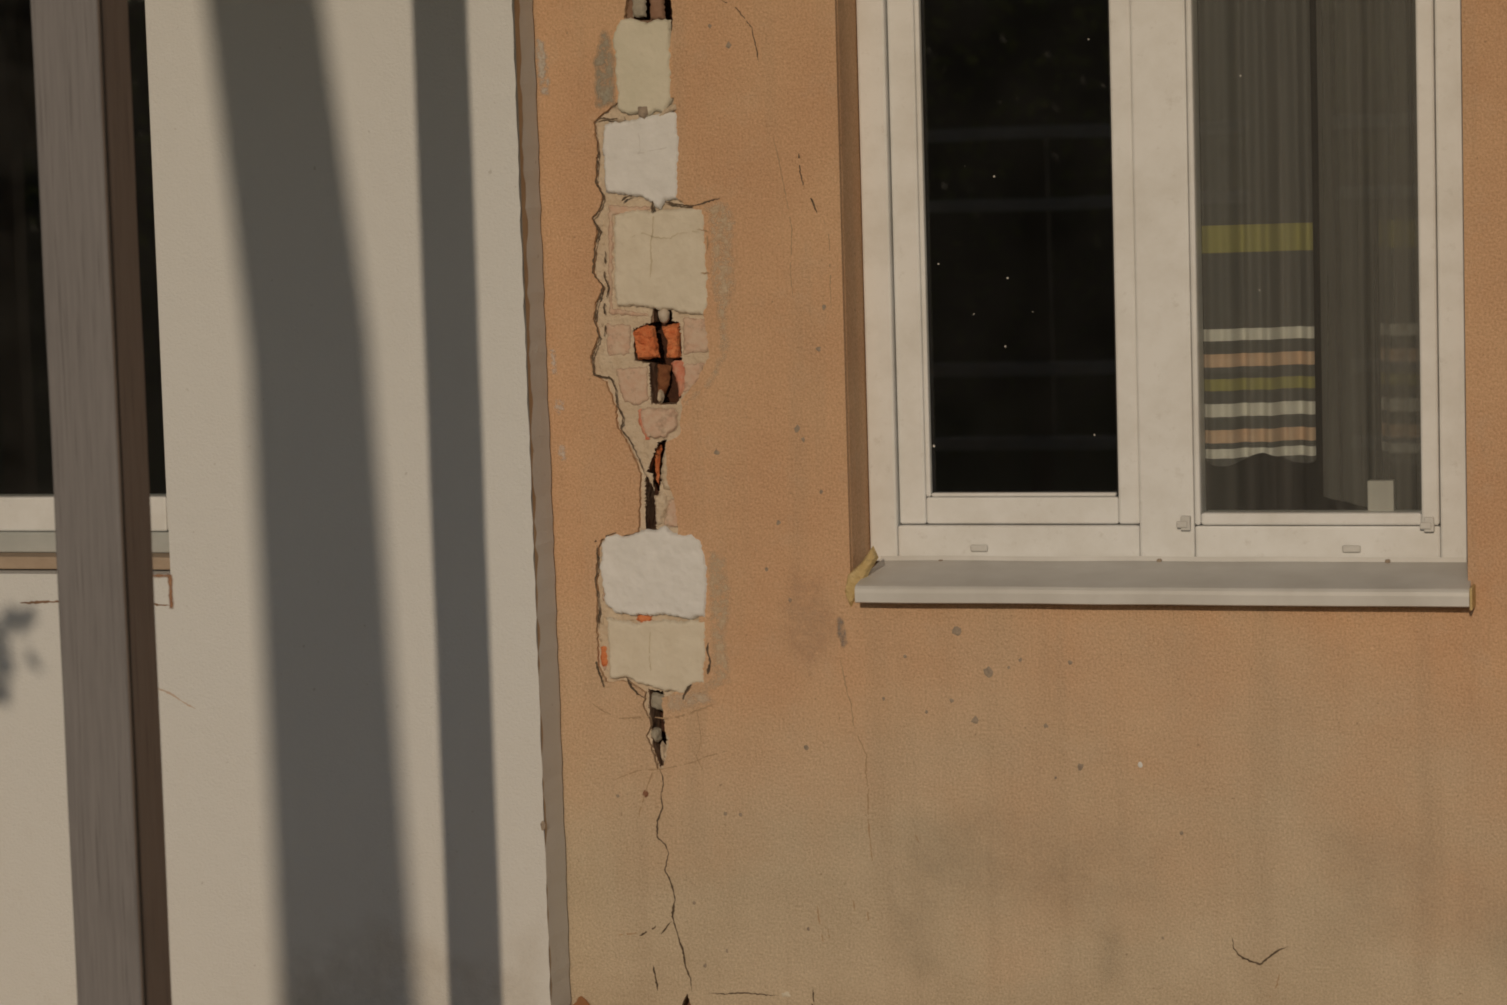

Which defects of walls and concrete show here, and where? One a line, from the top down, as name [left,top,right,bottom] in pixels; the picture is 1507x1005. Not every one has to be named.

crack [591,117,720,472]
flaking render [593,98,733,536]
crack [20,598,58,606]
flaking render [598,539,728,768]
crack [592,533,791,997]
crack [840,658,873,861]
crack [1232,939,1286,998]